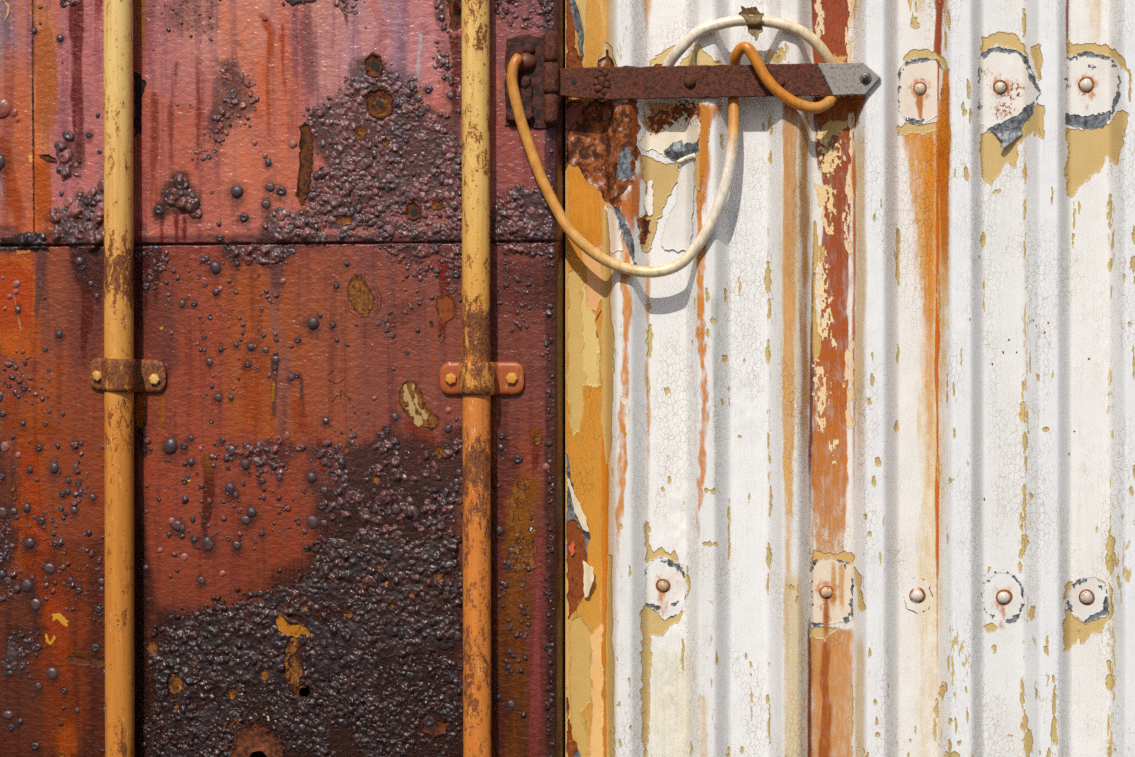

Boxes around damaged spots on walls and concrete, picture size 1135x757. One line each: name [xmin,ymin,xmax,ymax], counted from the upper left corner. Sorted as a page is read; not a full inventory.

rust [133,0,462,423]
peeling [566,206,630,476]
rust [783,95,866,552]
rust [811,0,856,64]
peeling [897,1,951,136]
rust [905,0,951,582]
peeling [953,8,1045,186]
peeling [1051,39,1132,204]
rust [135,397,463,757]
peeling [568,541,691,757]
peeling [786,548,866,642]
rust [808,565,852,757]